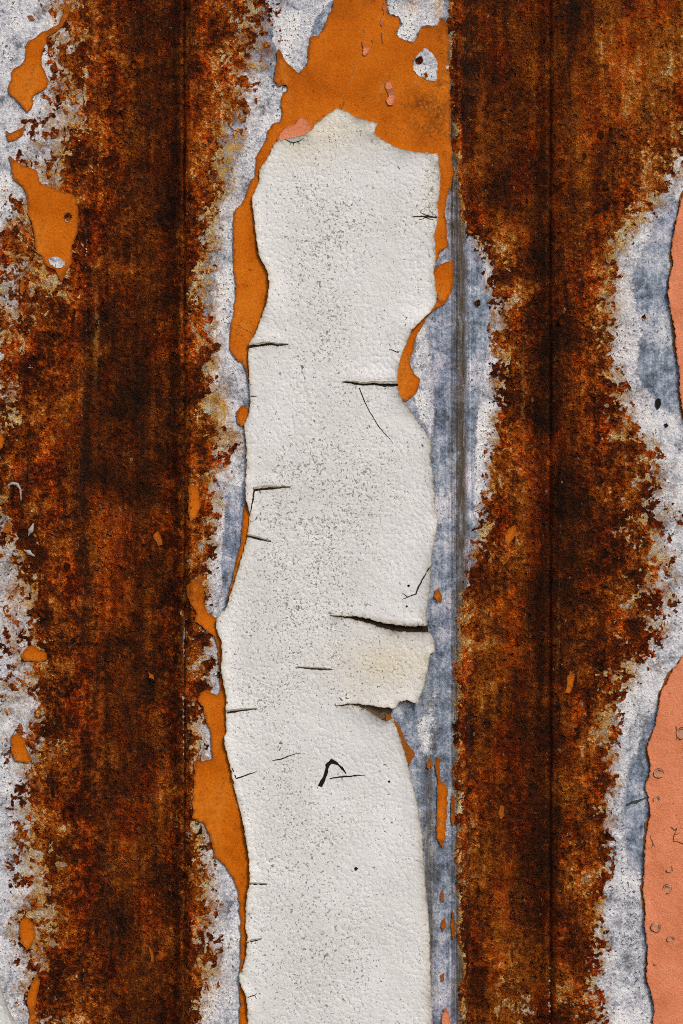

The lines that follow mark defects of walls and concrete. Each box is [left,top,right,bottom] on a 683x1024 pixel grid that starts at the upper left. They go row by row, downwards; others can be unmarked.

peeling [8,4,70,112]
peeling [9,156,78,281]
crack [249,340,289,348]
peeling [667,191,683,419]
crack [344,380,398,443]
rust [0,0,332,1024]
crack [247,485,290,542]
peeling [216,108,456,1024]
crack [330,615,428,632]
rust [387,0,683,1024]
crack [336,704,392,719]
peeling [640,655,683,1024]